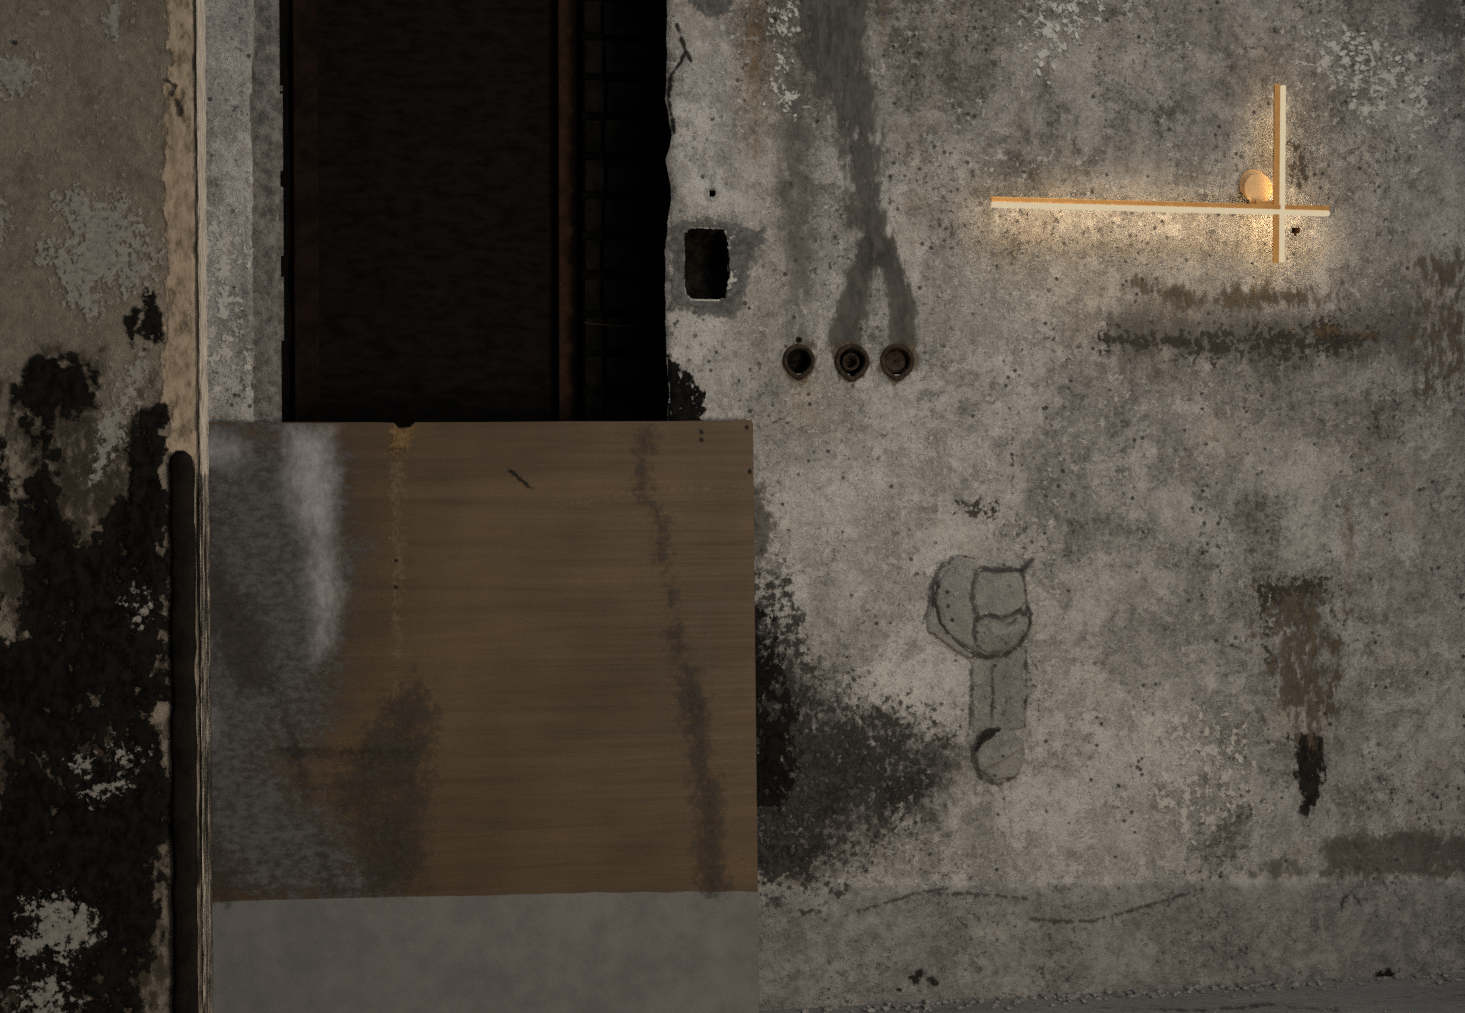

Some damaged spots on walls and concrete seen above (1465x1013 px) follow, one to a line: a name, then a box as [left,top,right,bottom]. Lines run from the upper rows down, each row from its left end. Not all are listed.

mould [124,287,166,351]
damp [785,0,918,350]
damp [1092,274,1414,370]
mould [0,346,173,1013]
damp [754,486,963,916]